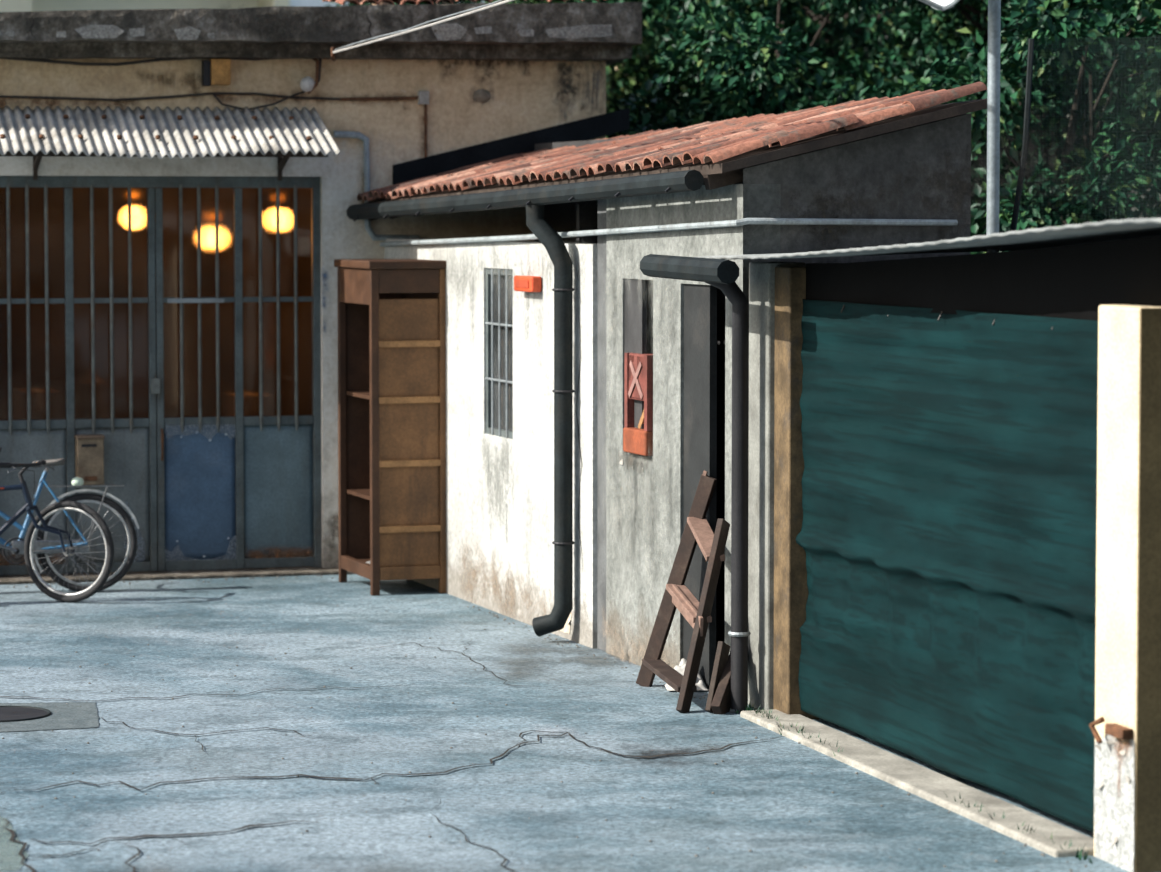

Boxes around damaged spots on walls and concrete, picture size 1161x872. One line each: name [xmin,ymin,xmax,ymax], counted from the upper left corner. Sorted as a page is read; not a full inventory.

crack [348,639,557,688]
crack [0,688,783,872]